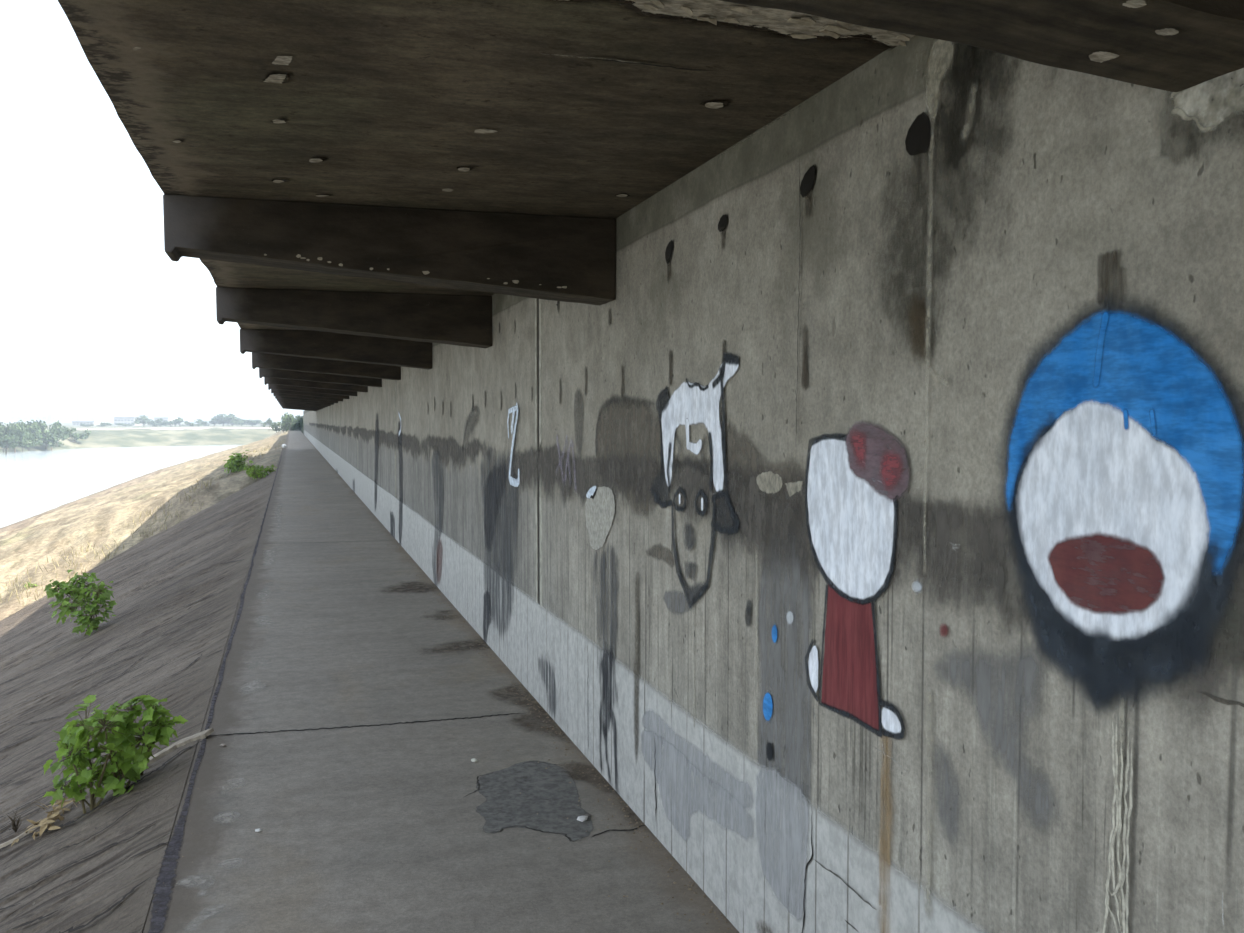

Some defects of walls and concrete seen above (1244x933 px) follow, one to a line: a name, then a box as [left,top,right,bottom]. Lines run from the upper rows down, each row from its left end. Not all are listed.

peeling [552,0,915,49]
water stain [883,39,1017,388]
crack [1196,691,1244,707]
crack [802,805,877,933]
efflorescence [1102,697,1133,933]